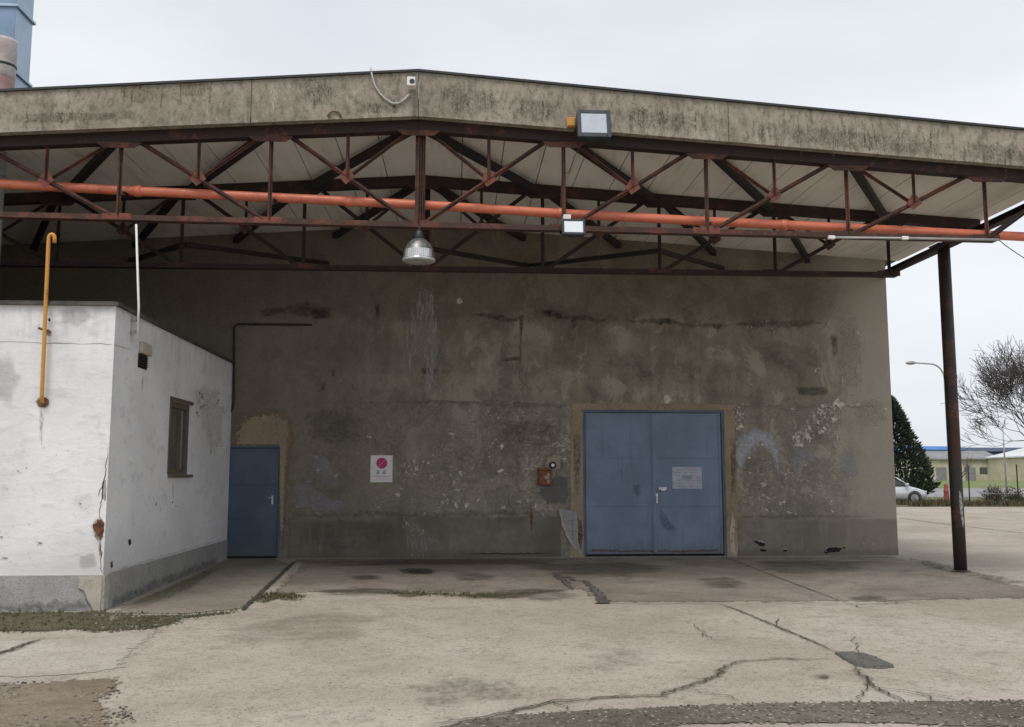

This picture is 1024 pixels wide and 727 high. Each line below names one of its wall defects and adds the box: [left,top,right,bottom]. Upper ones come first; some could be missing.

crack [98,456,108,519]
flaking render [195,386,289,541]
spalling [483,468,583,556]
peeling [781,397,848,451]
crack [441,634,952,725]